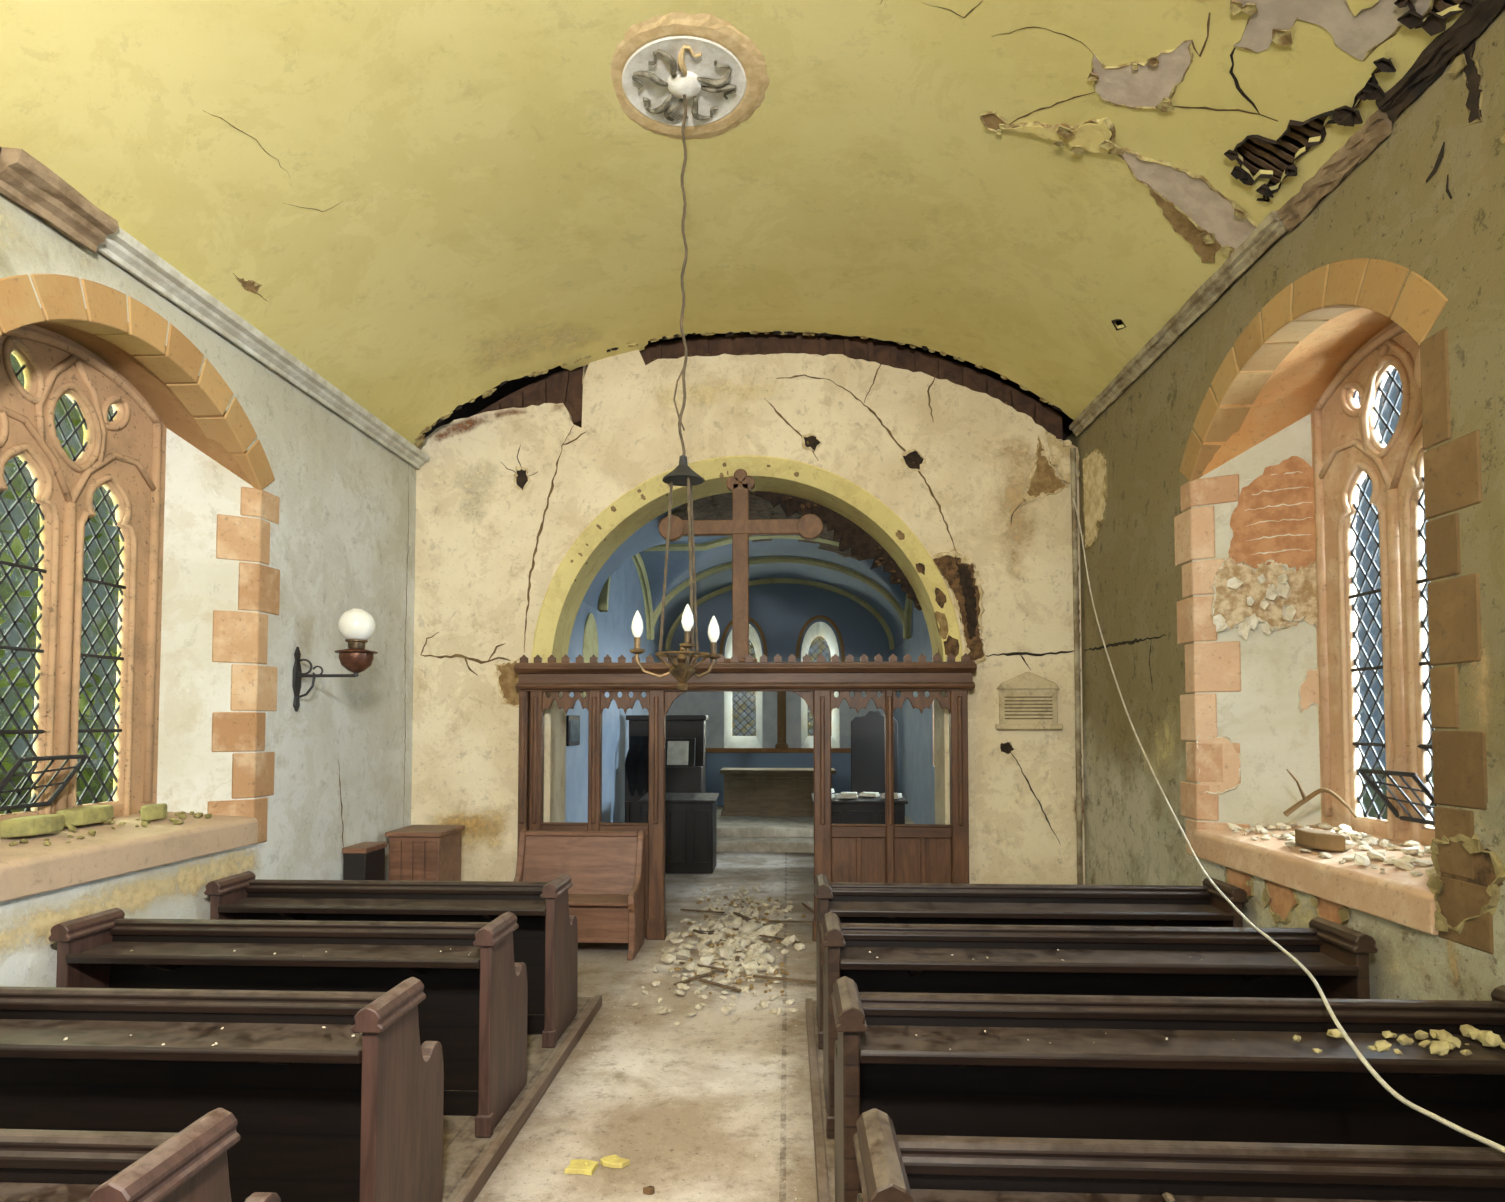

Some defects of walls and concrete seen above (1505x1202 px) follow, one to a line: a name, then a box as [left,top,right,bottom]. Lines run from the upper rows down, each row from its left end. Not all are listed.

crack [921,0,1085,46]
flaking render [1230,0,1434,61]
flaking render [1002,13,1278,263]
flaking render [1426,142,1452,199]
spalling [414,331,1108,549]
crack [765,362,956,551]
flaking render [1212,456,1318,640]
crack [403,425,585,826]
spalling [915,549,986,664]
water stain [0,852,254,947]
flaking render [1427,833,1505,934]